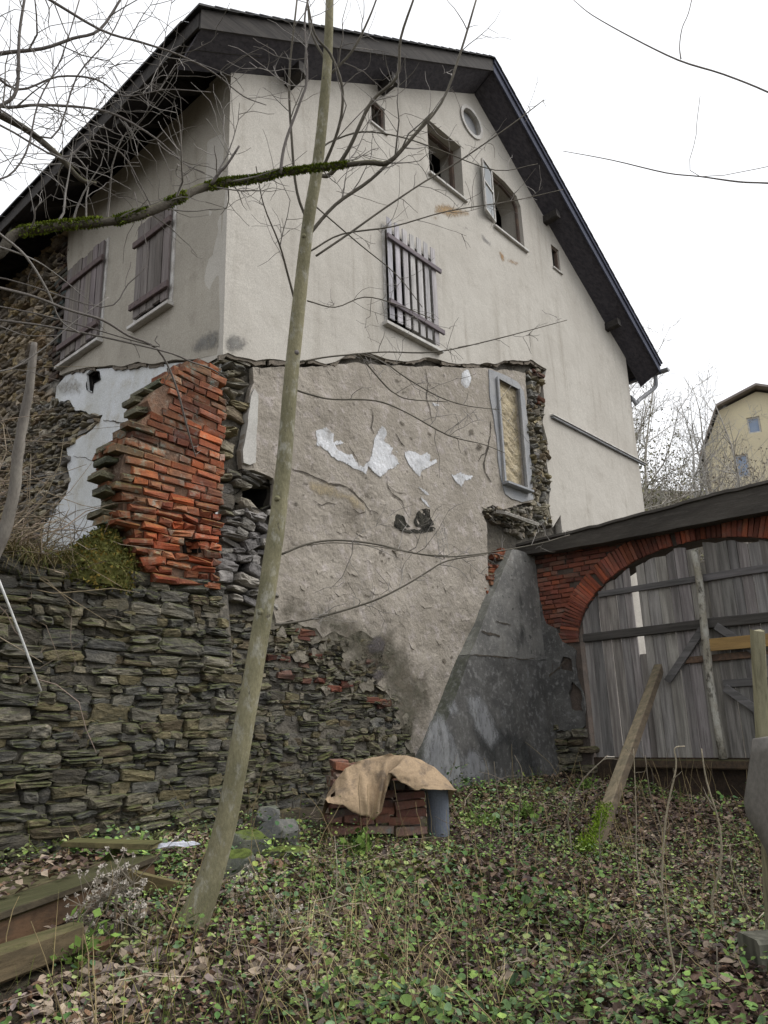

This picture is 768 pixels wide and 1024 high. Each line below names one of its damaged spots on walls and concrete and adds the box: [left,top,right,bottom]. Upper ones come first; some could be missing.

flaking render [113,362,165,371]
water stain [194,333,245,350]
flaking render [300,355,356,367]
hole [182,538,202,553]
flaking render [213,353,285,700]
peeling [316,426,437,533]
flaking render [440,360,553,540]
flaking render [243,592,415,817]